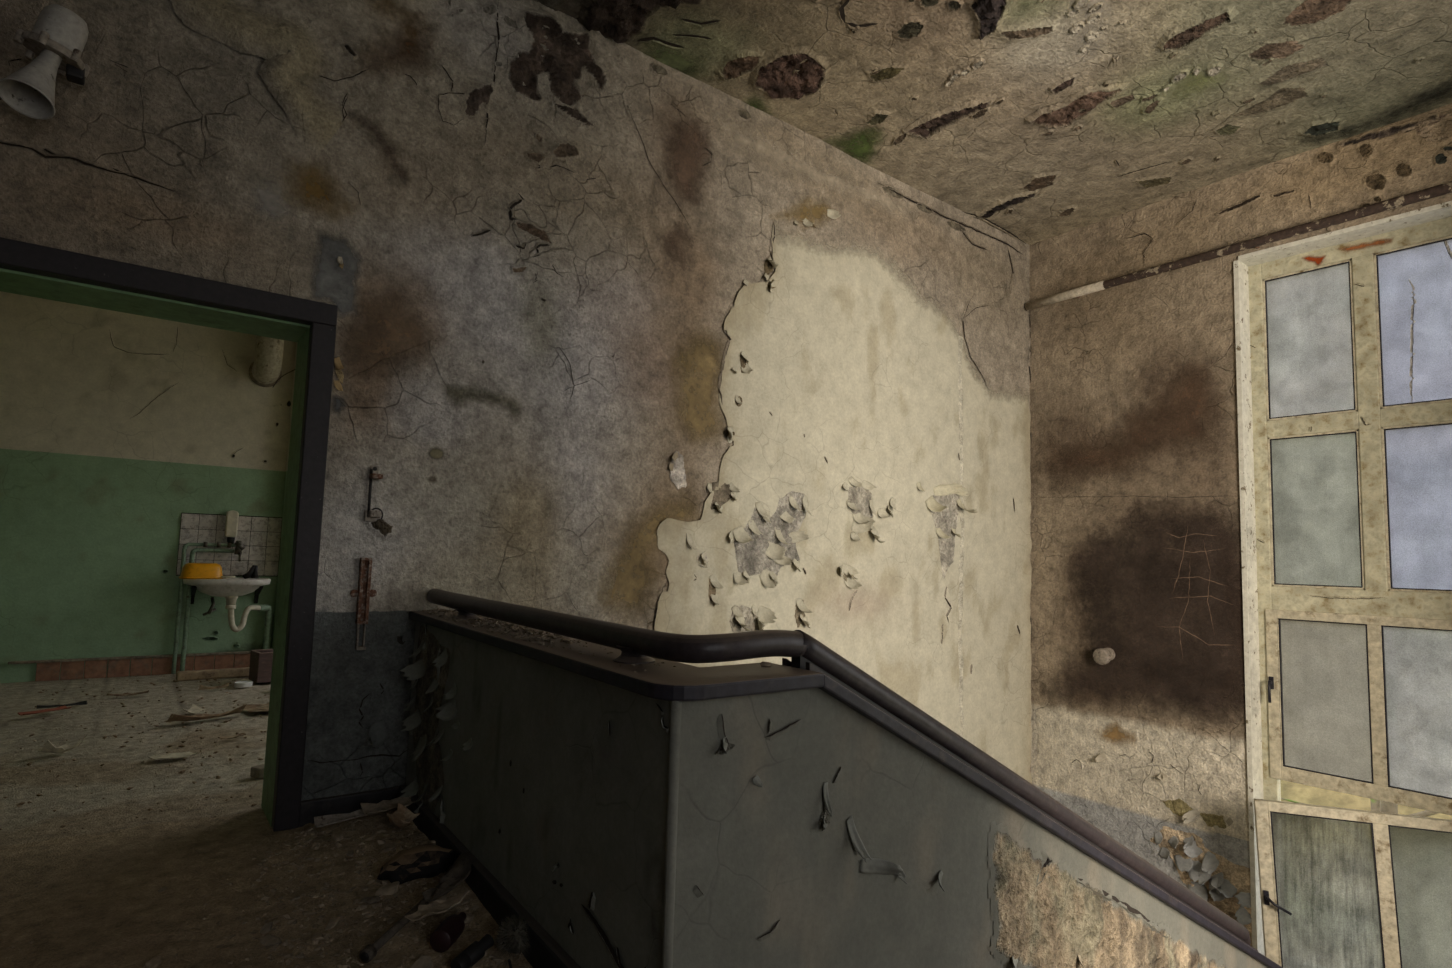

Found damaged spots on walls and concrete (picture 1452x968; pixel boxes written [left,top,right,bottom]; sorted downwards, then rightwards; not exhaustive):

crack [0,139,178,192]
crack [319,69,368,122]
crack [403,0,502,144]
spalling [457,0,707,166]
spalling [862,93,1005,146]
spalling [891,0,1127,87]
water stain [1318,81,1452,141]
peeling [687,482,815,633]
peeling [843,476,896,543]
water stain [1043,510,1245,718]
flaking render [985,821,1234,968]
peeling [1150,799,1252,946]